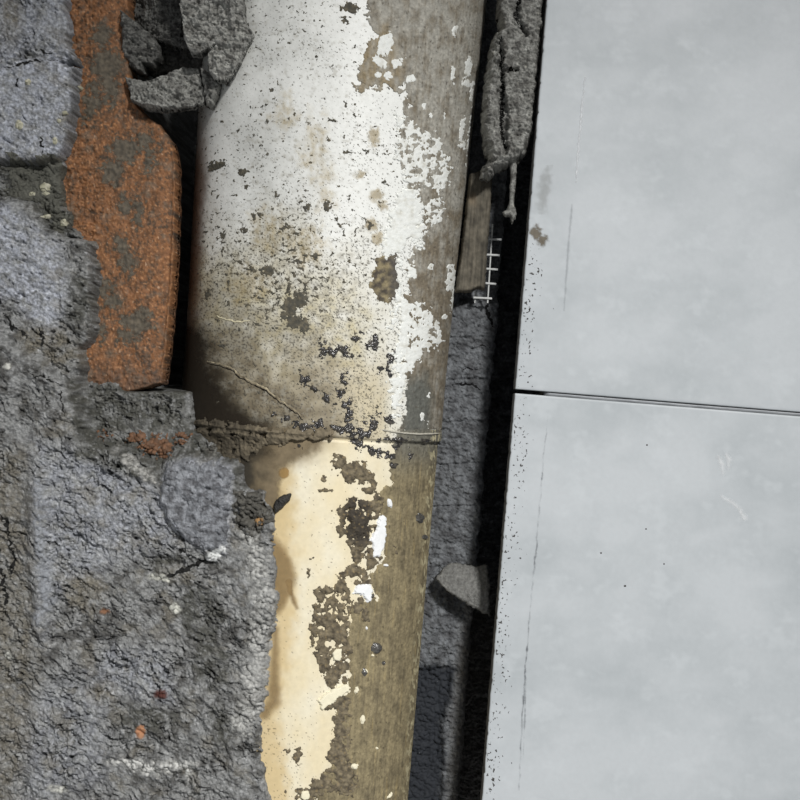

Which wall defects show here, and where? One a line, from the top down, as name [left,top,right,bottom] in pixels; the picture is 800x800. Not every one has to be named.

peeling [372,31,403,81]
peeling [450,55,475,151]
peeling [369,113,456,419]
crack [217,315,250,323]
leakage [182,325,264,439]
crack [207,361,303,420]
peeling [369,499,392,567]
peeling [352,584,373,603]
peeling [317,684,359,711]